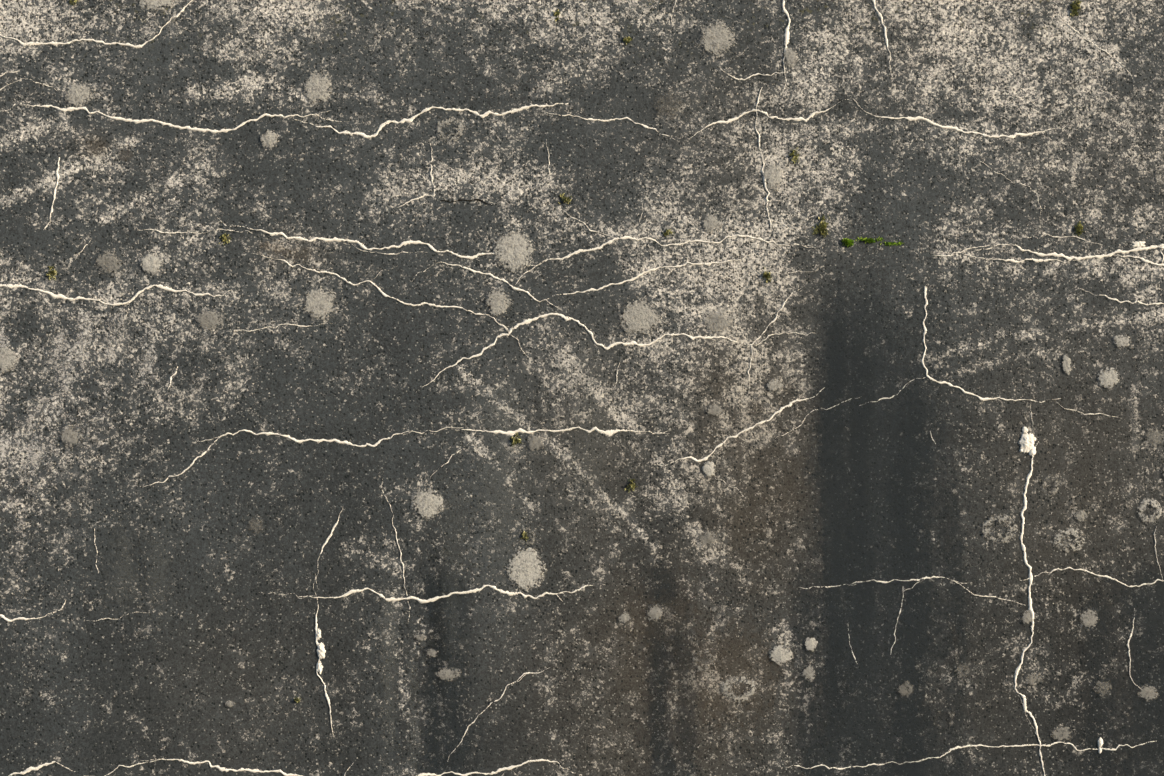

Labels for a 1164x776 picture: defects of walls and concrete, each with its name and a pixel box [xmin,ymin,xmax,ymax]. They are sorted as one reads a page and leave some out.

crack [0,0,1164,393]
leakage [1018,427,1036,456]
crack [144,286,1164,776]
crack [0,600,135,622]
crack [9,761,75,776]
crack [105,759,301,776]